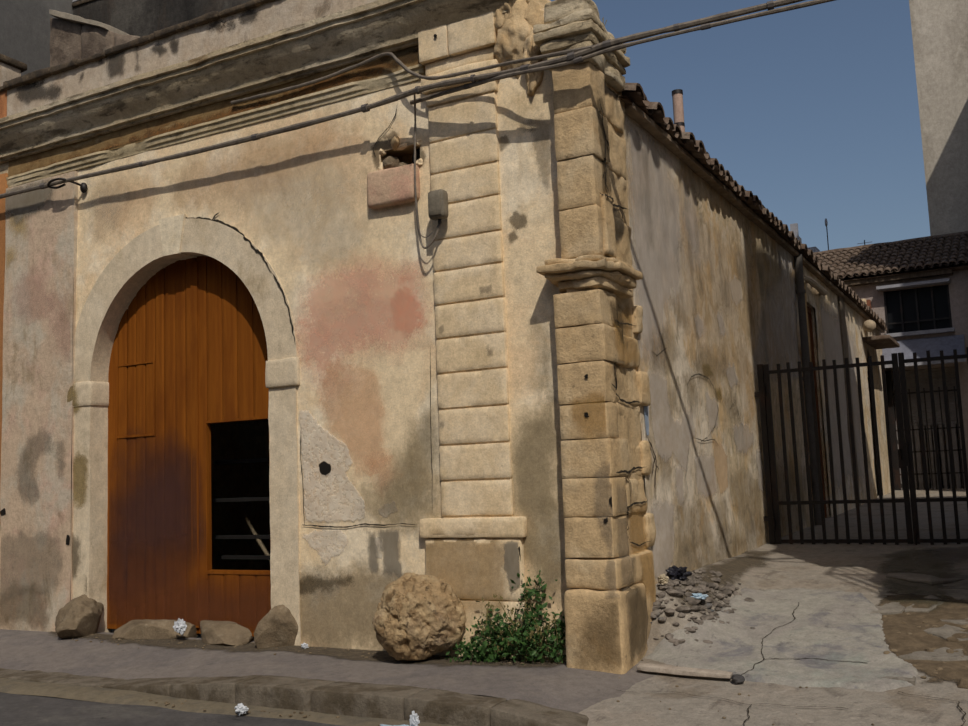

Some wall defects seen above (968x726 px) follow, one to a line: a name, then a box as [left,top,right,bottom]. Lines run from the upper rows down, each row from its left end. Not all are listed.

damp [16,82,60,103]
spalling [494,0,551,97]
spalling [378,135,423,170]
damp [613,207,624,241]
crack [185,212,295,342]
crack [612,368,640,404]
spalling [299,411,365,565]
crack [616,439,659,546]
crack [685,362,745,529]
crack [741,602,799,675]